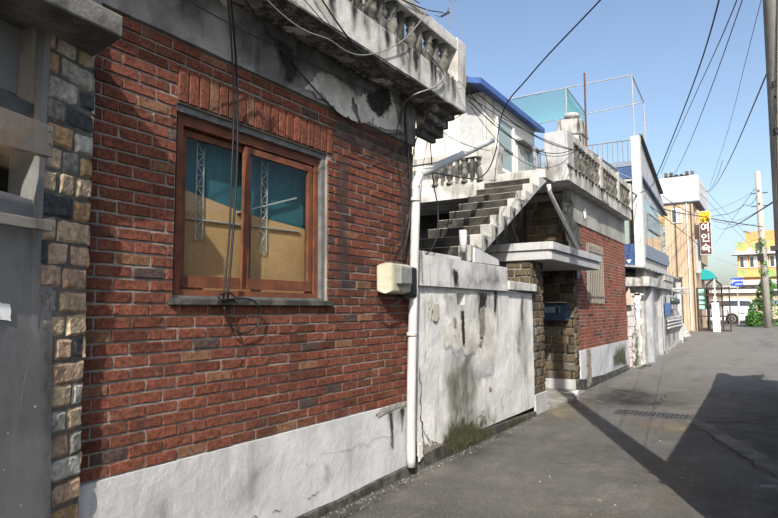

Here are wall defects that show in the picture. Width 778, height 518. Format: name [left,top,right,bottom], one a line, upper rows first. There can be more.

peeling [220,0,450,131]
spalling [453,310,465,345]